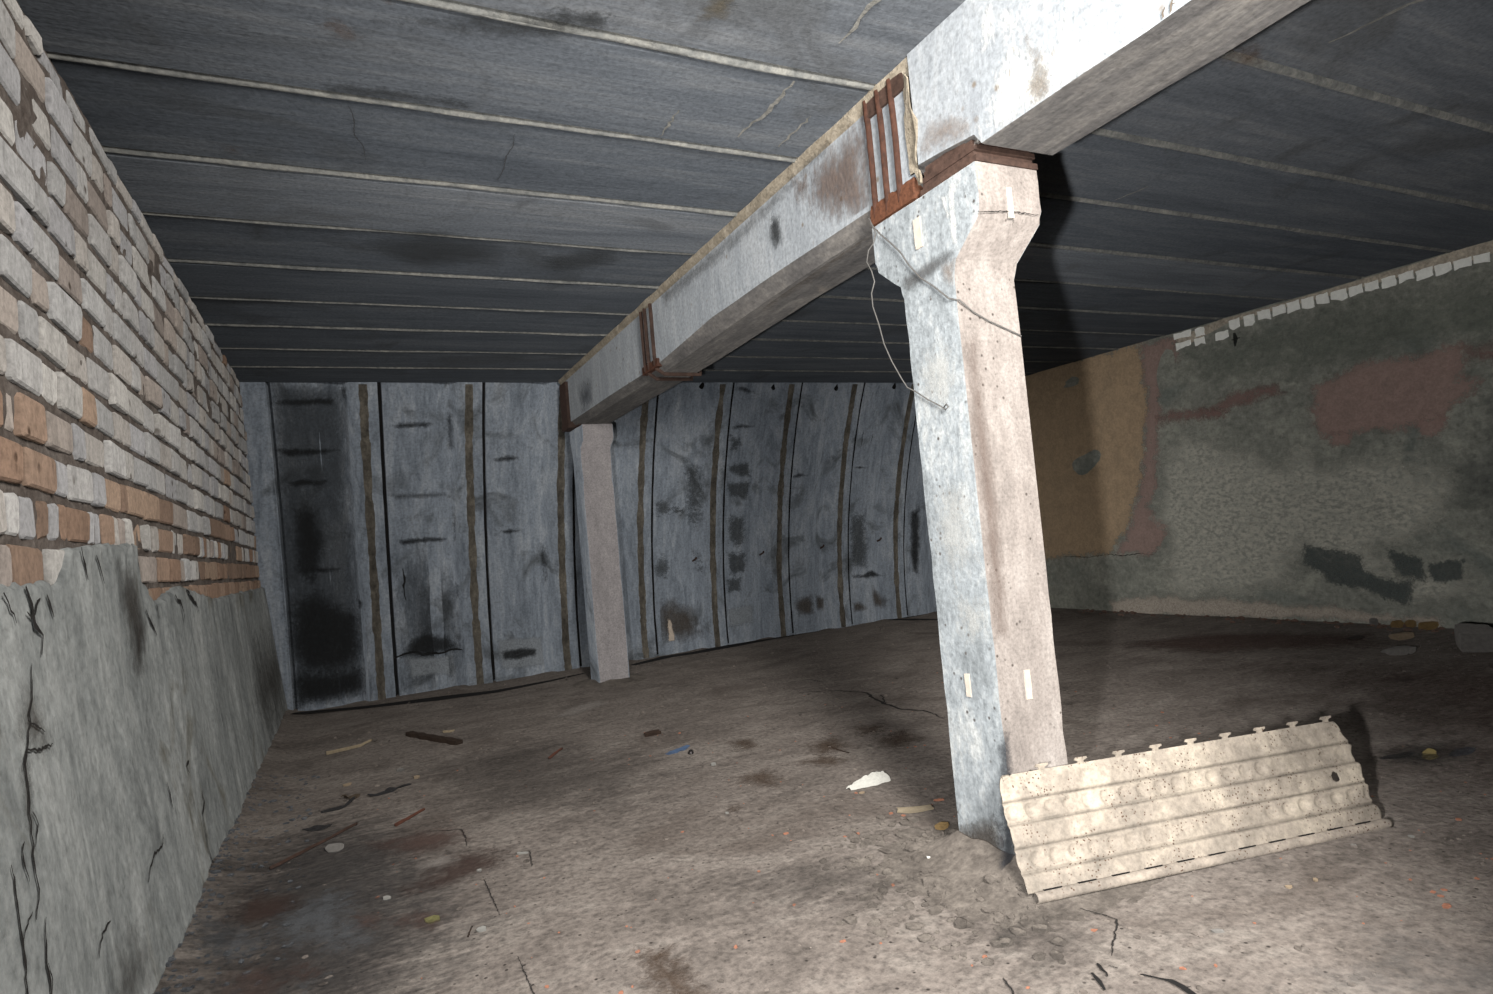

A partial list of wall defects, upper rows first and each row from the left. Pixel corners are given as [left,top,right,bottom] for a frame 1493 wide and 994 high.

crack [3,586,54,994]
leakage [260,510,361,702]